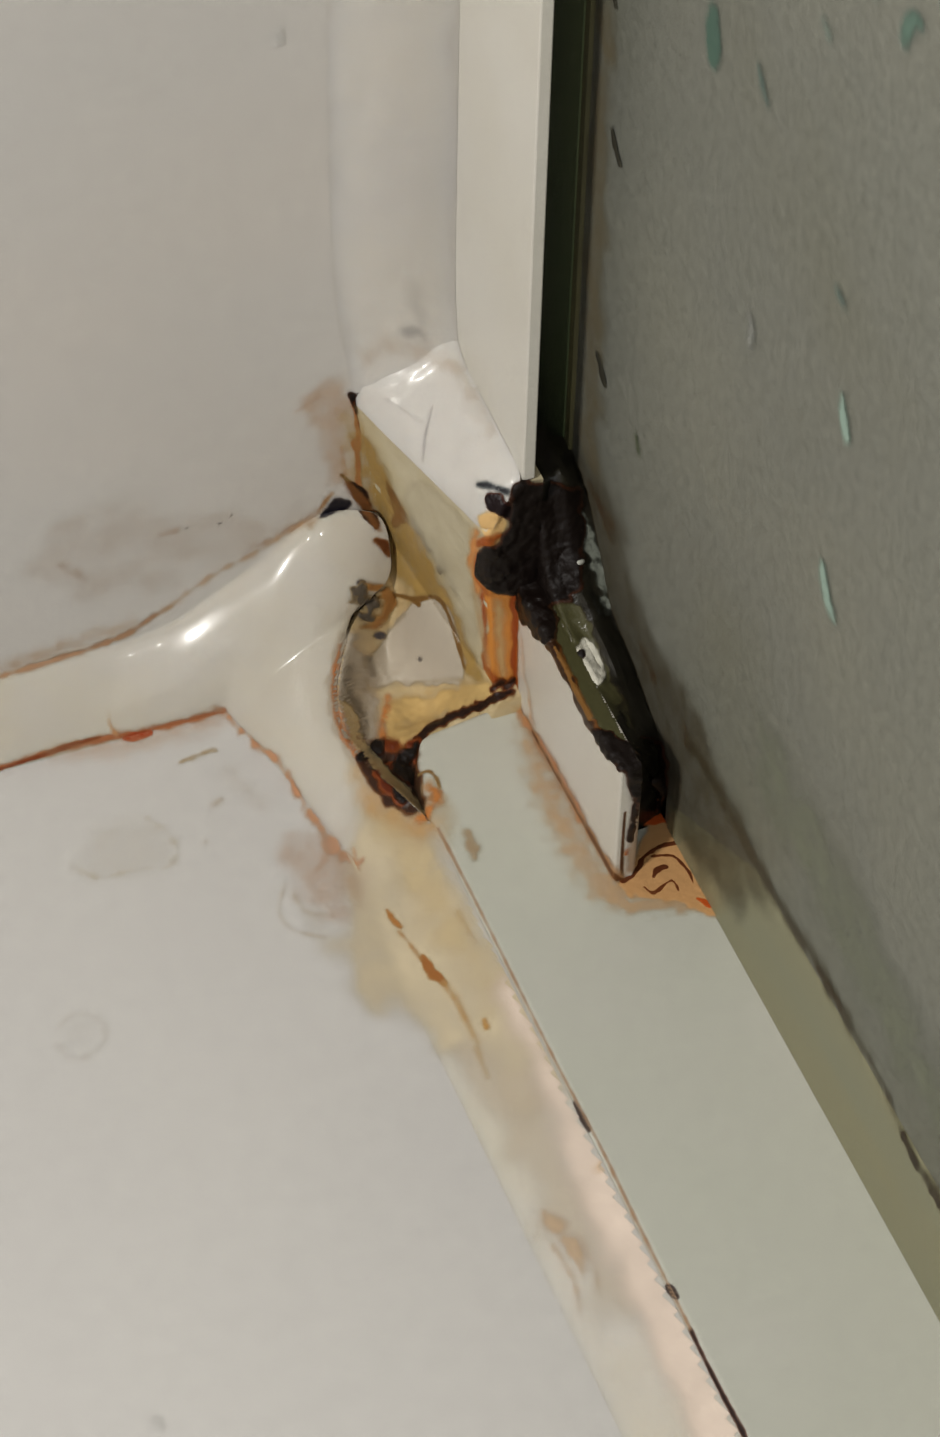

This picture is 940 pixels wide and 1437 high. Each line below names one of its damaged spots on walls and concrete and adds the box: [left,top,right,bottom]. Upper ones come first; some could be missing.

peeling [366,594,466,688]
rust [379,511,518,748]
rust [0,707,364,867]
rust [362,770,444,837]
rust [464,830,479,859]
rust [516,708,716,916]
rust [386,909,489,1030]
leakage [348,738,738,1437]